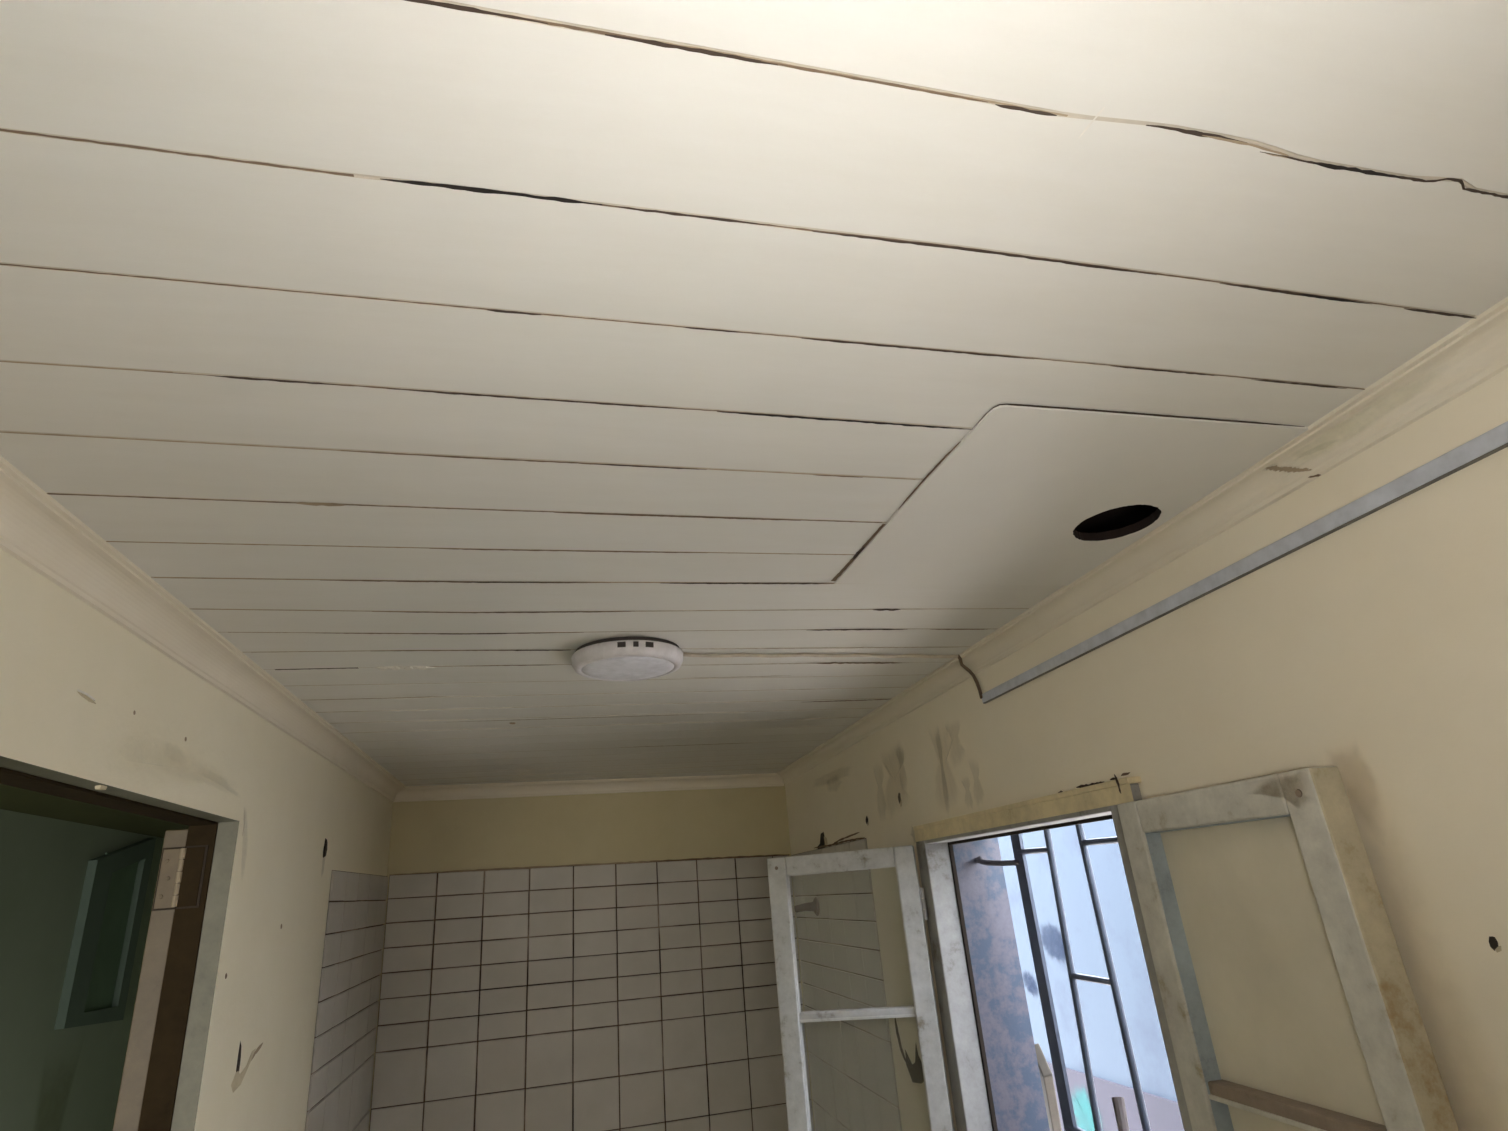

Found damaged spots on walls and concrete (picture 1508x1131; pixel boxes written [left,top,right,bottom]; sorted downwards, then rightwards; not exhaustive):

crack [405,0,1068,117]
crack [0,125,1508,318]
crack [3,432,915,480]
crack [47,493,988,747]